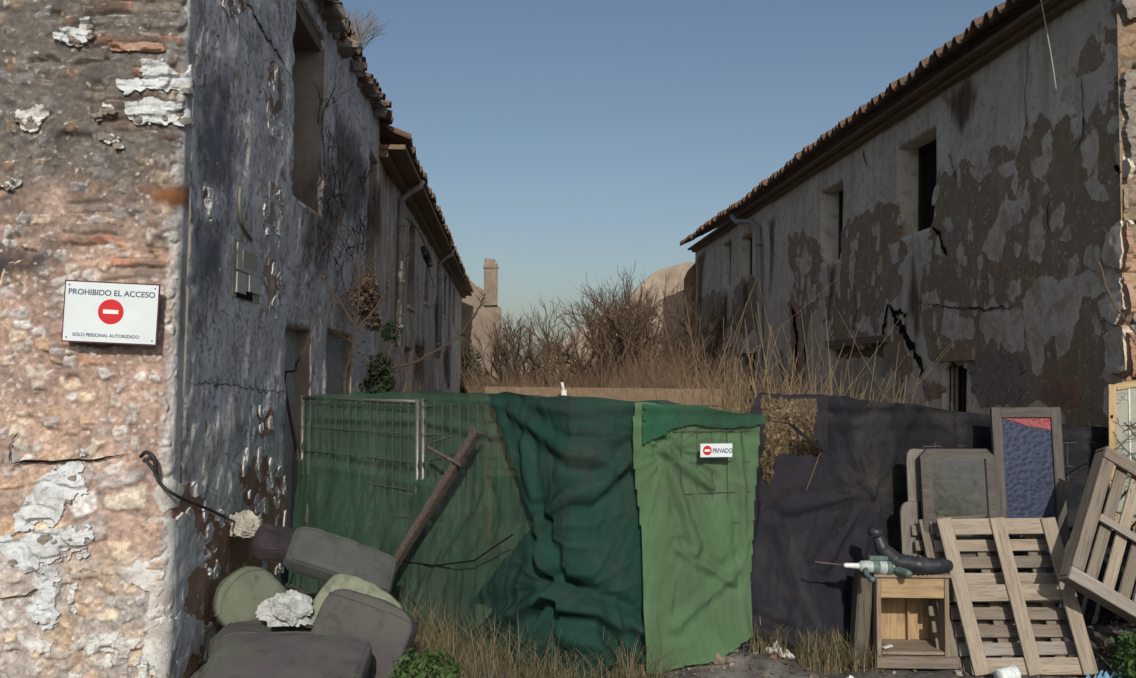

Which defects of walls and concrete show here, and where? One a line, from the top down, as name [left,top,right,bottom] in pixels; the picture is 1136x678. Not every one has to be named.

peeling [52,16,196,150]
water stain [196,221,222,293]
peeling [777,0,1136,428]
crack [789,281,857,388]
crack [882,303,1016,381]
peeling [0,448,95,654]
peeling [74,405,288,678]